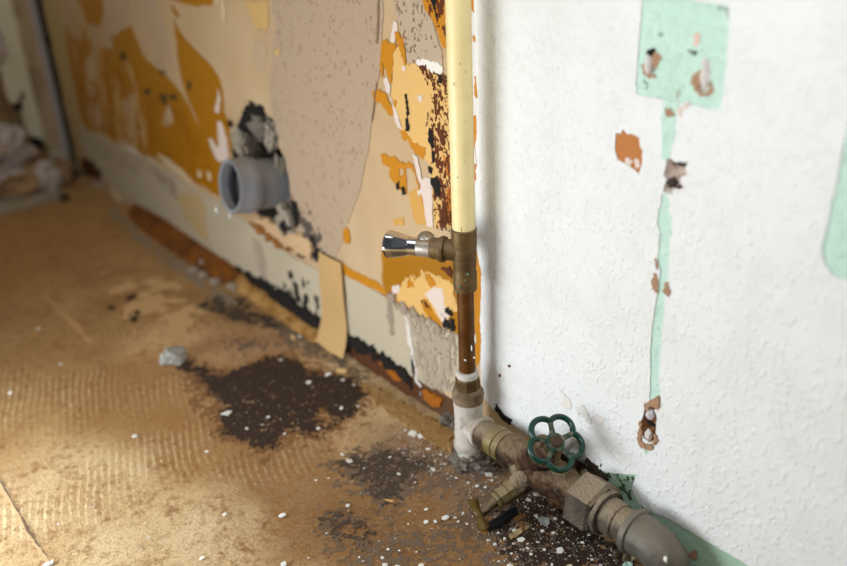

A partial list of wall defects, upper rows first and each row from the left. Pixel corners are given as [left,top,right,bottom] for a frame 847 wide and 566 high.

rust [426,0,446,37]
peeling [65,0,286,196]
peeling [372,21,452,229]
rust [417,55,452,232]
peeling [615,130,643,173]
leakage [234,235,321,331]
flaking render [248,187,317,260]
peeling [342,251,458,334]
peeling [474,255,482,367]
leakage [650,258,671,297]
peeling [636,0,729,455]
leakage [107,276,641,566]